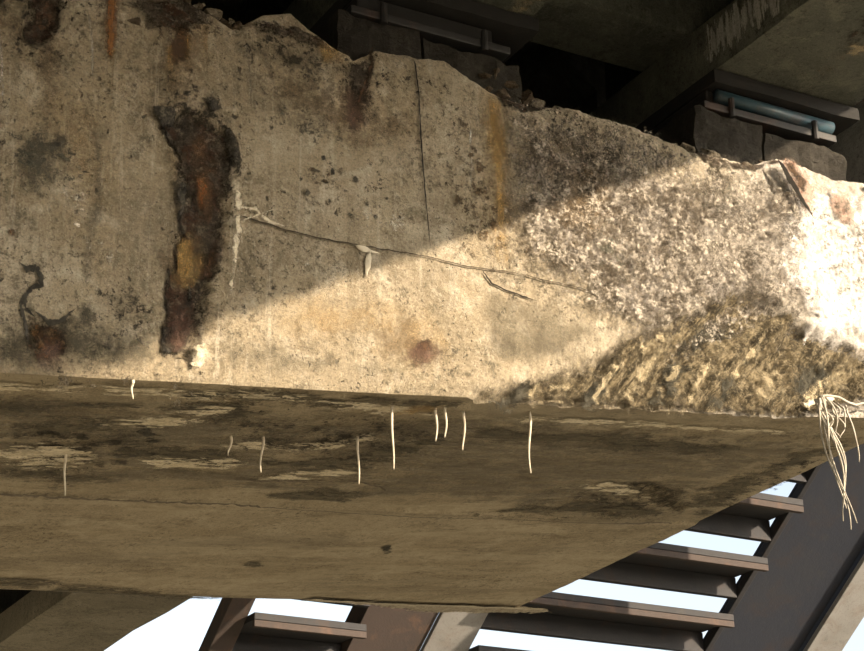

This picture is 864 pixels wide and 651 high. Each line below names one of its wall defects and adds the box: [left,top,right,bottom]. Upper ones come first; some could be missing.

spalling [23,0,62,45]
corrosion [105,0,117,58]
spalling [119,0,338,53]
water stain [159,68,242,132]
spalling [344,46,374,129]
crack [241,61,660,316]
spalling [478,68,864,418]
corrosion [27,304,96,367]
water stain [0,280,851,521]